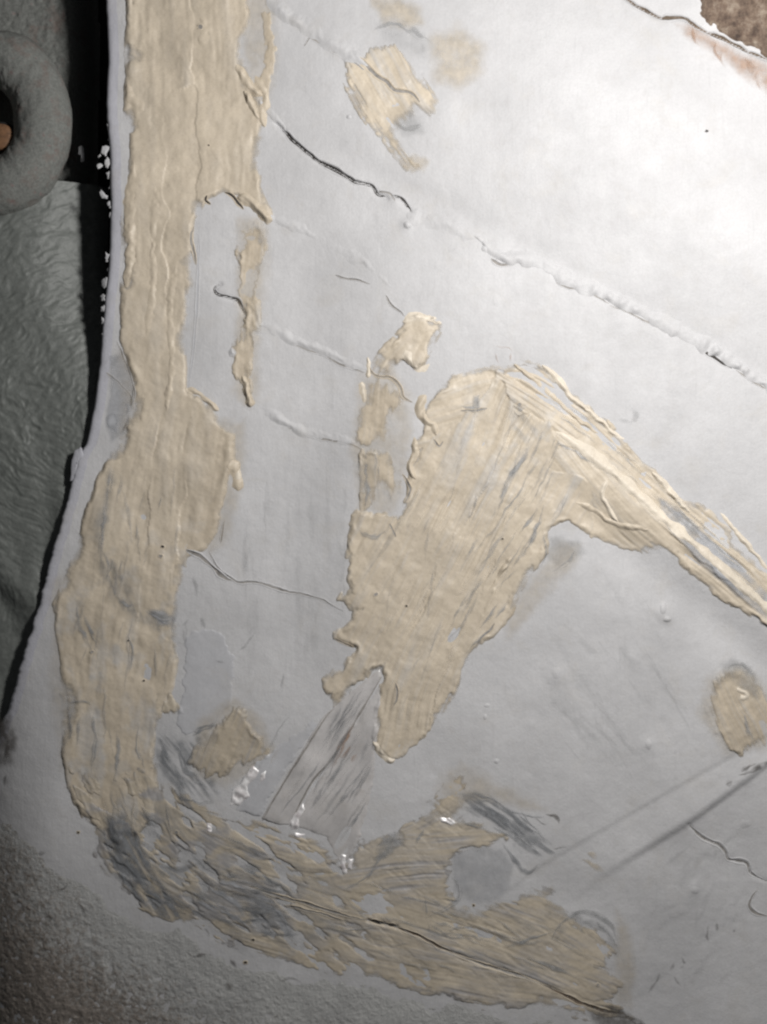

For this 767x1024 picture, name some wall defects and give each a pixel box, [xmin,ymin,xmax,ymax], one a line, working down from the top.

spalling [97,0,111,336]
crack [278,125,412,212]
peeling [70,447,84,482]
crack [186,520,343,611]
crack [688,825,767,917]
crack [249,886,624,1015]